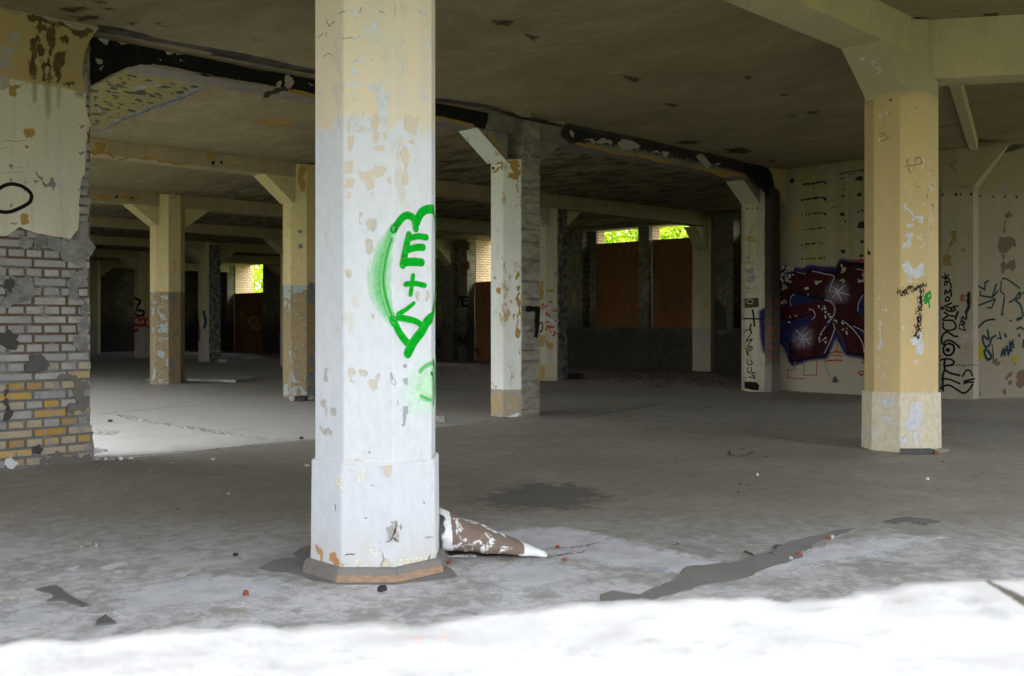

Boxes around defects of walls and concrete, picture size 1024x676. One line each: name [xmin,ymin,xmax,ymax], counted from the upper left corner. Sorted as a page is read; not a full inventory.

peeling [0,30,28,97]
peeling [79,50,324,168]
peeling [344,2,420,199]
peeling [569,130,743,178]
peeling [359,212,377,263]
flaking render [3,277,15,293]
peeling [145,292,183,383]
peeling [494,271,521,355]
peeling [902,326,924,364]
peeling [348,364,408,392]
peeling [873,397,923,447]
spalling [379,520,402,543]